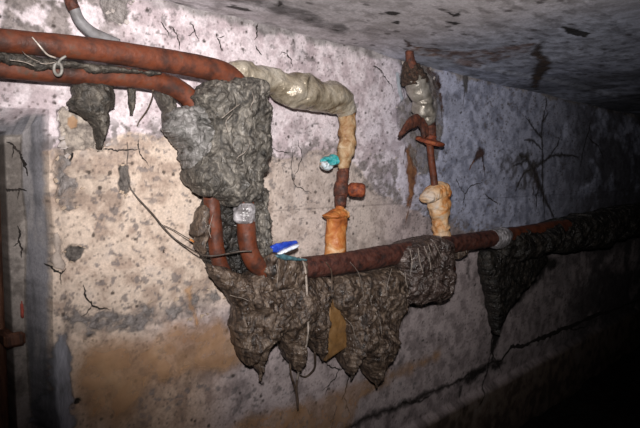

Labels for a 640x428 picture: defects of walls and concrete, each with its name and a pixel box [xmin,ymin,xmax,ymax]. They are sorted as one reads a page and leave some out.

crack [6,142,28,198]
spalling [53,106,111,211]
rust [403,144,417,219]
crack [515,96,603,218]
crack [13,226,23,258]
crack [44,263,66,285]
peeling [50,233,86,270]
crack [83,285,109,316]
crack [324,299,640,428]